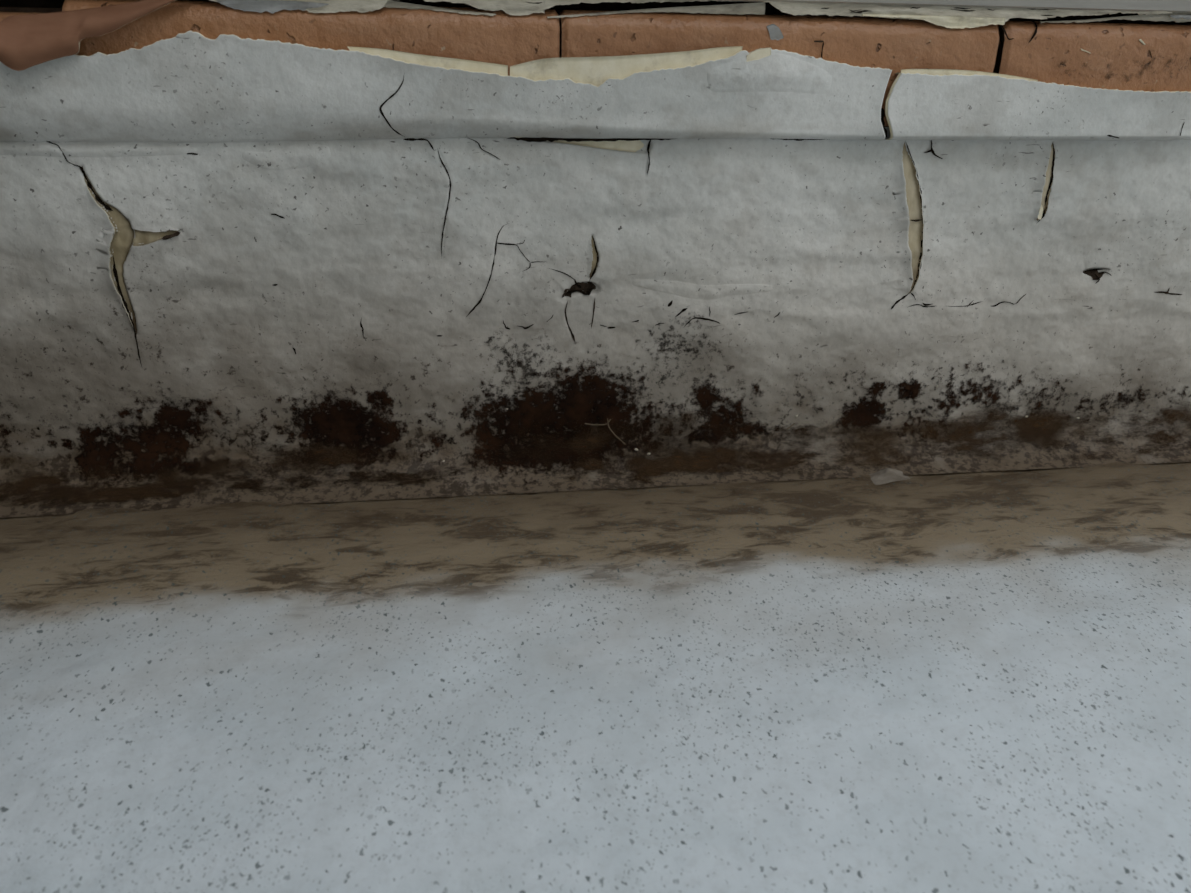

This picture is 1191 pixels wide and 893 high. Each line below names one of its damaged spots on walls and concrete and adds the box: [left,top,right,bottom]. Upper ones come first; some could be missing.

peeling [0,0,176,71]
peeling [347,46,771,87]
crack [881,91,891,137]
peeling [900,69,1038,82]
crack [379,78,451,257]
peeling [1032,143,1055,223]
crack [47,141,180,366]
crack [467,224,540,316]
crack [909,294,1026,307]
leakage [0,312,1191,505]